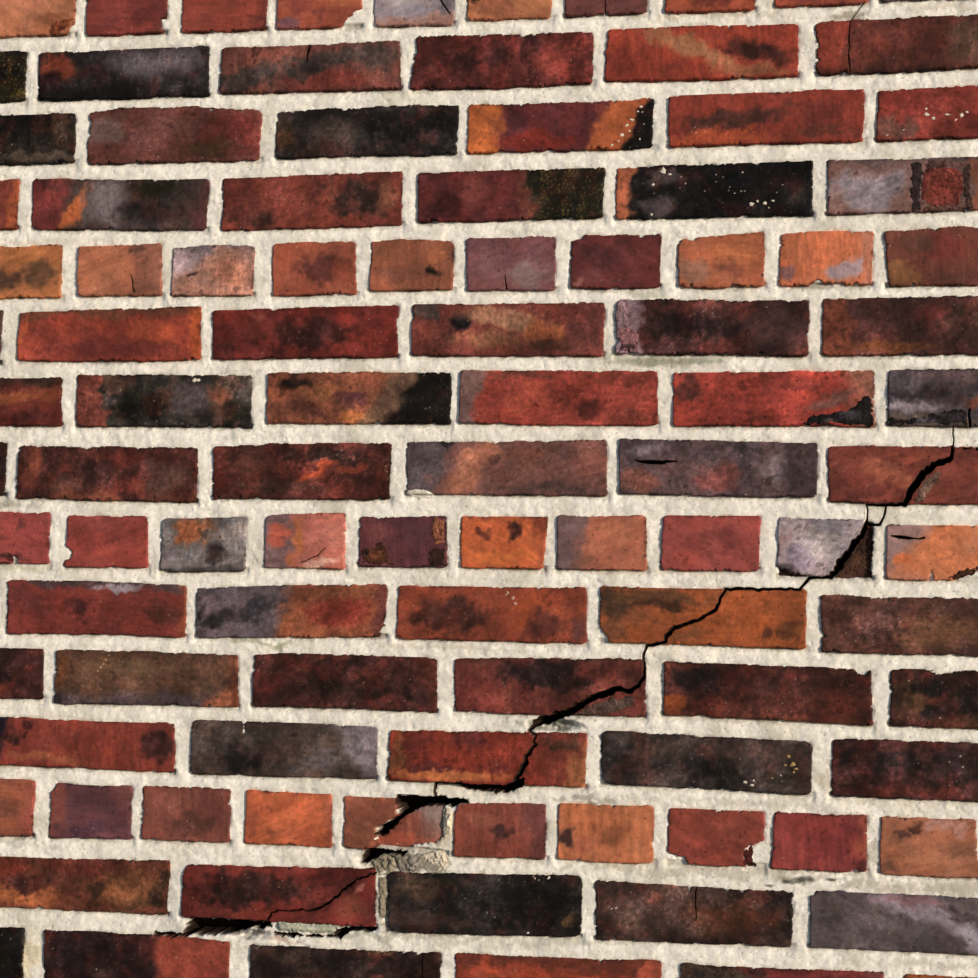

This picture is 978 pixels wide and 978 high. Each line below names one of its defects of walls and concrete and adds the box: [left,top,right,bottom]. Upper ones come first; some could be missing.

spalling [838,528,875,578]
crack [151,407,978,941]
spalling [373,808,454,918]